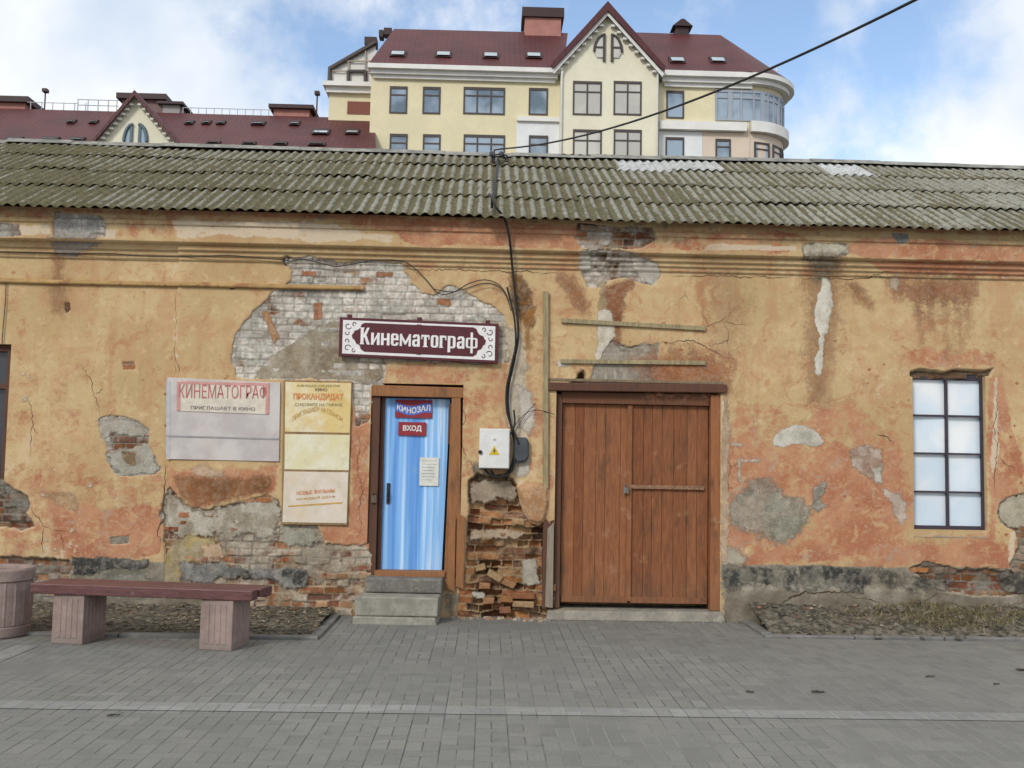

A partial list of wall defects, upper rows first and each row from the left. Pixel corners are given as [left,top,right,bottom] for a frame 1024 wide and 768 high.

spalling [232,256,535,435]
spalling [588,280,659,384]
peeling [814,275,834,376]
spalling [0,479,78,530]
spalling [98,415,161,477]
spalling [0,488,372,617]
spalling [456,458,556,618]
peeling [720,395,1024,596]
crack [993,387,1008,499]